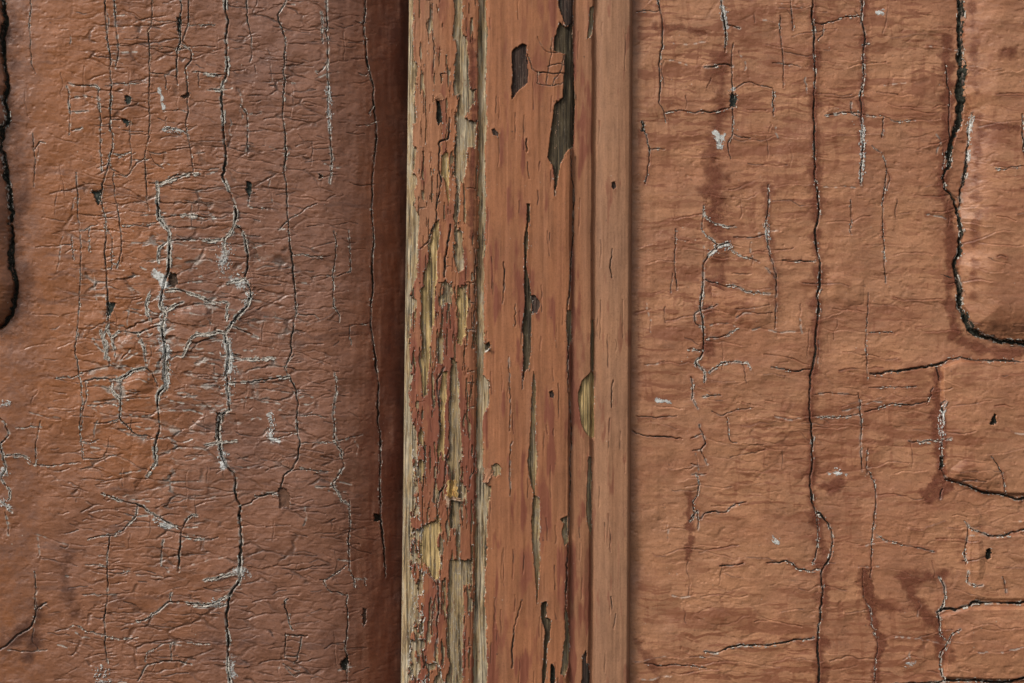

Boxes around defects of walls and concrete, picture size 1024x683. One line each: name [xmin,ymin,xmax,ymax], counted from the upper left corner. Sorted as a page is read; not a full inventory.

peeling [511,44,528,99]
peeling [548,0,575,193]
peeling [586,6,594,39]
crack [0,0,386,683]
peeling [401,0,502,683]
peeling [521,204,590,683]
peeling [578,320,595,438]
crack [633,0,1024,683]